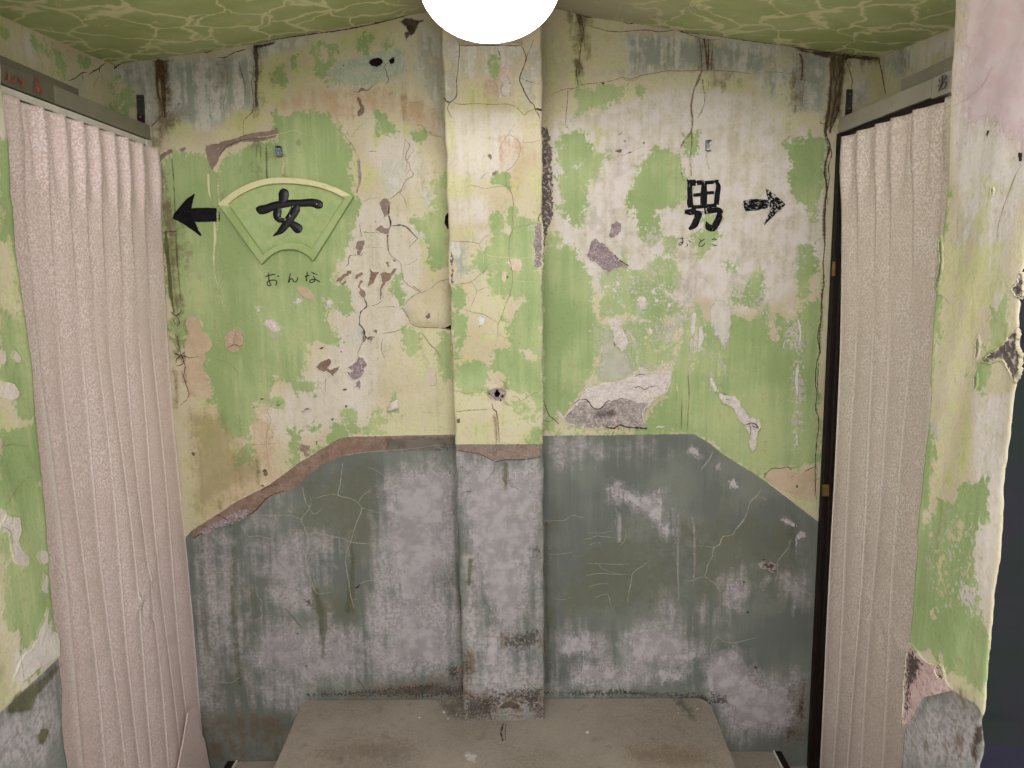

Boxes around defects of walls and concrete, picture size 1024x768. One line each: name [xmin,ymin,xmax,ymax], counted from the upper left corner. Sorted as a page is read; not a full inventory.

leakage [164,231,181,313]
leakage [207,170,224,346]
peeling [334,196,398,301]
peeling [314,327,379,391]
crack [193,9,886,651]
spalling [562,367,673,431]
spalling [972,327,1024,391]
leakage [386,436,455,451]
leakage [781,518,806,558]
peeling [0,514,61,683]
leakage [307,459,801,738]
peeling [901,642,954,729]